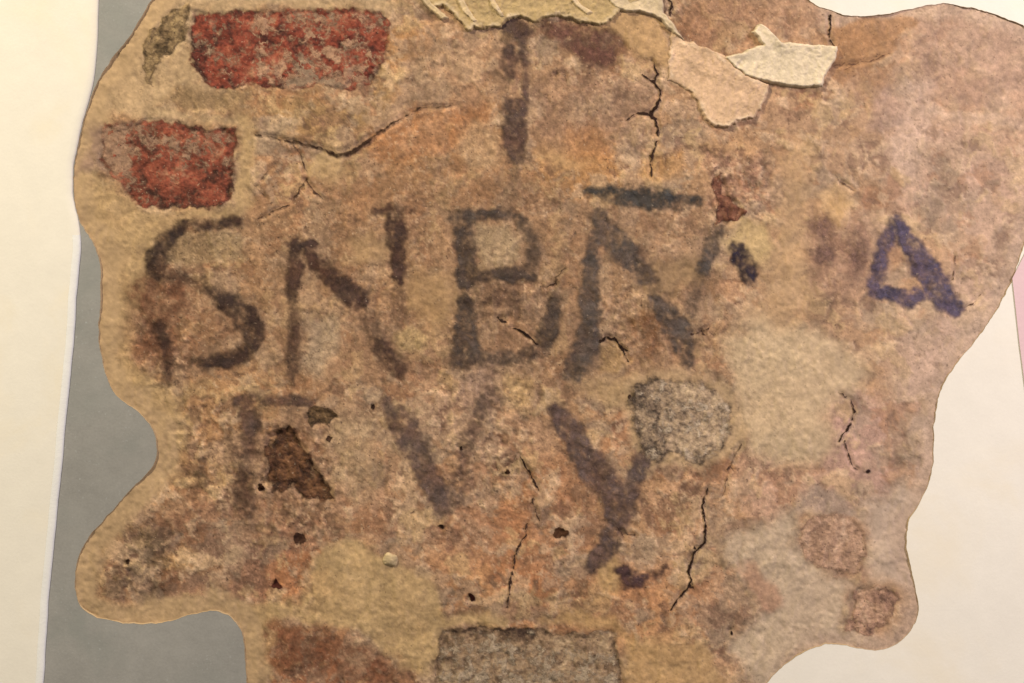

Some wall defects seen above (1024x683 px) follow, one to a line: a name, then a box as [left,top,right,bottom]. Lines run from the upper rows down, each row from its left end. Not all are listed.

crack [255,106,449,219]
flaking render [421,0,838,128]
crack [626,64,661,177]
spalling [264,426,333,502]
crack [839,393,858,470]
crack [506,457,540,608]
crack [670,444,742,611]